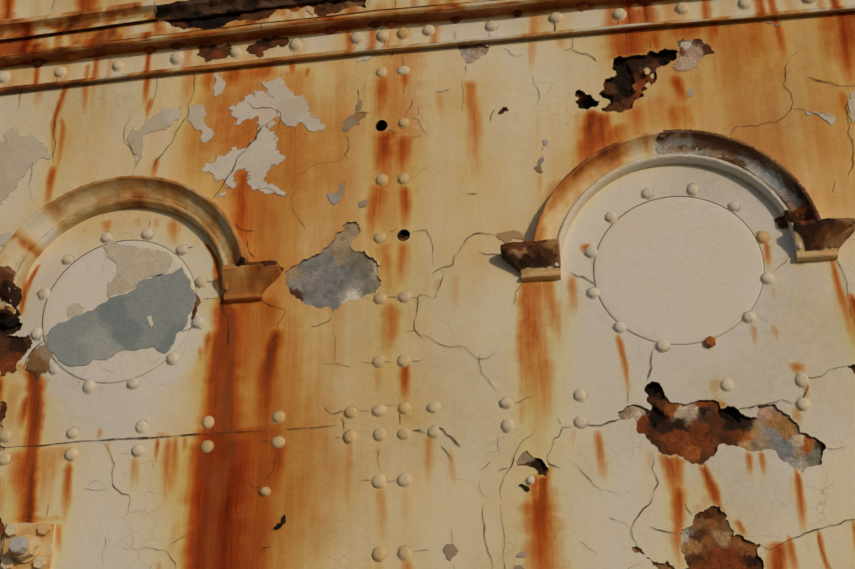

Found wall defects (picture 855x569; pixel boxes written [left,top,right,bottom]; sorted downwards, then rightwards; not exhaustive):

spalling [153,0,366,30]
peeling [201,77,326,197]
corrosion [774,199,855,250]
corrosion [0,266,32,377]
peeling [25,242,201,380]
corrosion [264,333,277,383]
crack [411,230,501,389]
corrosion [25,373,40,523]
crack [479,438,519,569]
crack [609,457,672,543]
spalling [618,382,826,473]
crack [795,519,855,557]